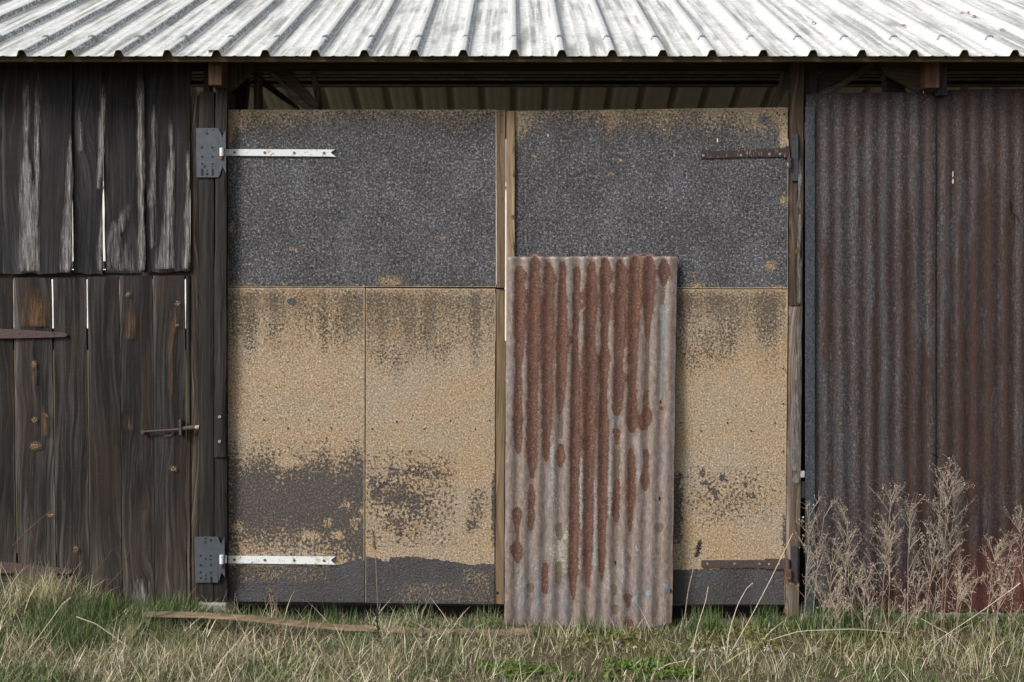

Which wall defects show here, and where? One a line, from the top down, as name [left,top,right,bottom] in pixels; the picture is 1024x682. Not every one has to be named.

leakage [228,435,495,563]
rust [510,254,671,629]
leakage [673,466,782,544]
rust [887,537,1024,611]